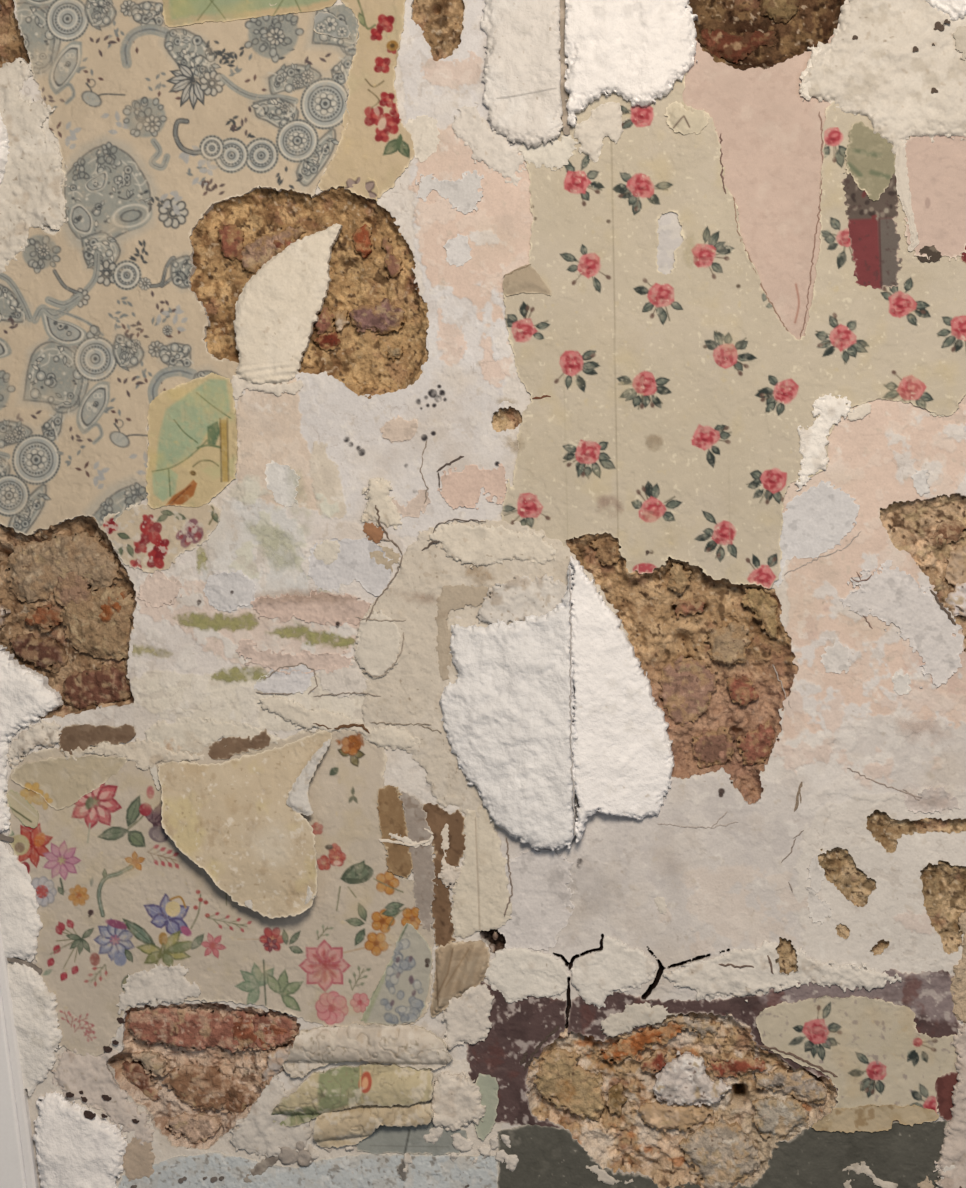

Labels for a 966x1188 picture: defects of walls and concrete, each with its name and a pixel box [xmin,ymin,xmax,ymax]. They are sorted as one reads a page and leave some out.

spalling [412,0,465,61]
peeling [682,0,845,339]
spalling [190,187,429,400]
spalling [0,515,137,719]
spalling [566,480,860,804]
spalling [840,470,966,695]
spalling [866,786,966,853]
spalling [66,1002,301,1149]
crack [520,934,604,1070]
crack [641,946,774,1000]
spalling [464,847,966,1188]